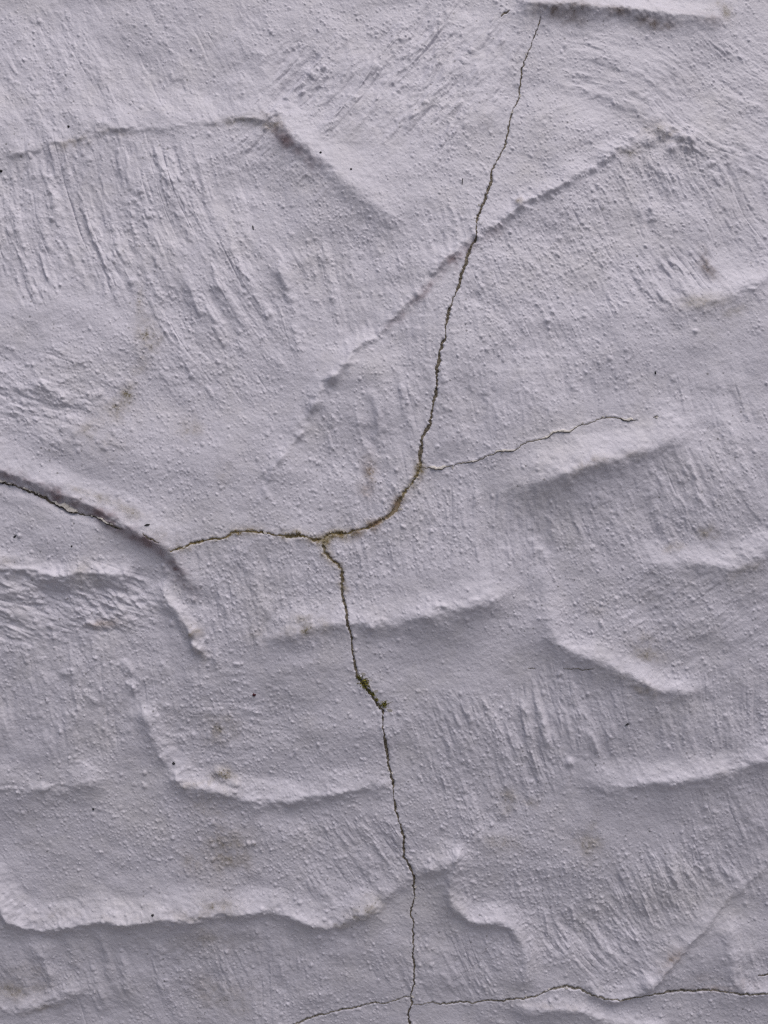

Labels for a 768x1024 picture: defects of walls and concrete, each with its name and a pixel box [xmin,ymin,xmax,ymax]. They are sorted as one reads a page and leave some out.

crack [0,479,122,529]
crack [170,17,768,1024]